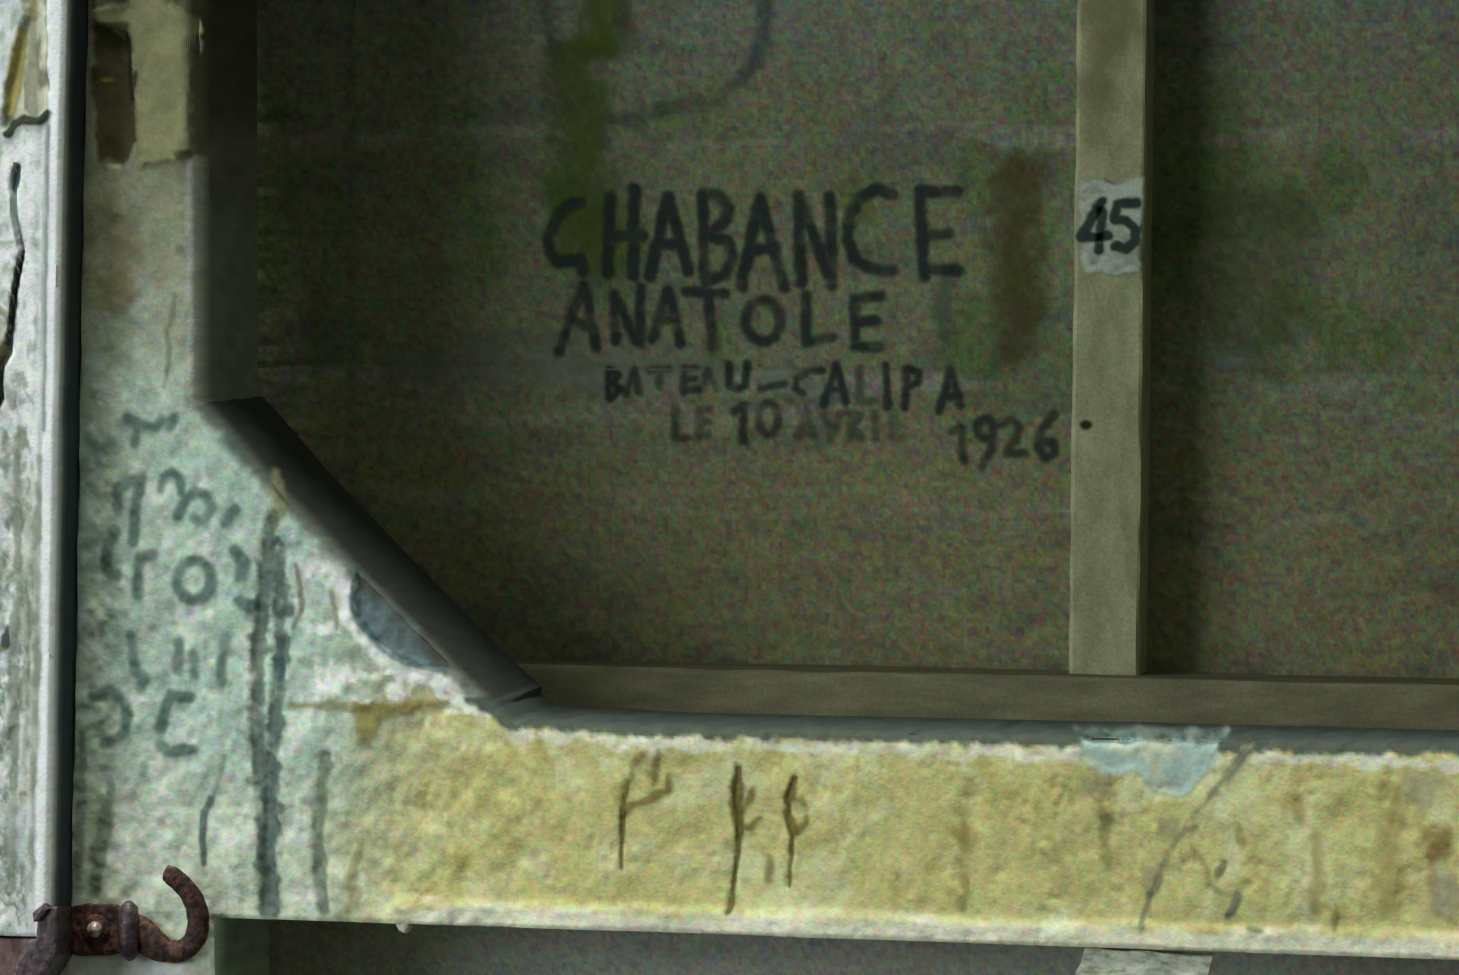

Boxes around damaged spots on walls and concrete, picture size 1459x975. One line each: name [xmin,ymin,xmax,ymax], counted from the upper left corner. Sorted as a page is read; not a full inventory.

flaking render [91,0,136,164]
crack [0,125,49,431]
spalling [1078,726,1229,798]
crack [1138,745,1262,932]